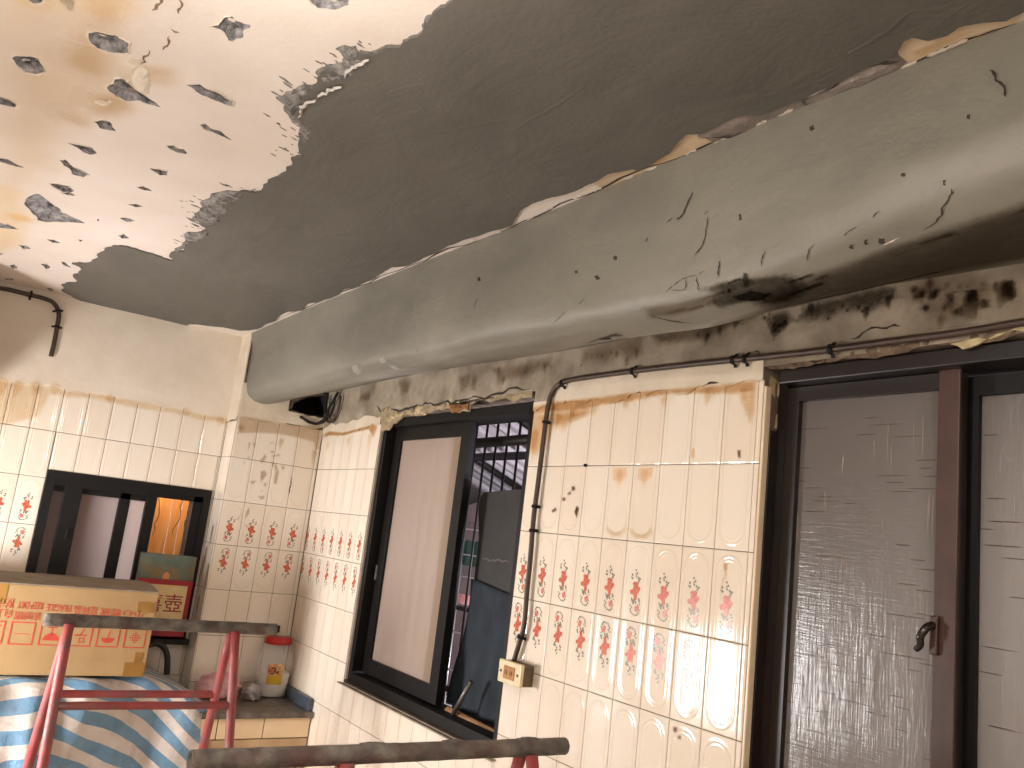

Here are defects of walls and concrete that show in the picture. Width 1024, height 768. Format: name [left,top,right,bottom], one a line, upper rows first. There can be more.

spalling [308,0,349,10]
spalling [208,16,250,41]
peeling [88,32,160,107]
spalling [188,84,236,107]
peeling [298,59,369,118]
spalling [68,143,96,155]
spalling [50,160,90,196]
crack [925,188,954,229]
damp [711,274,822,336]
damp [802,290,894,319]
flaking render [767,327,1024,397]
flaking render [379,391,534,432]